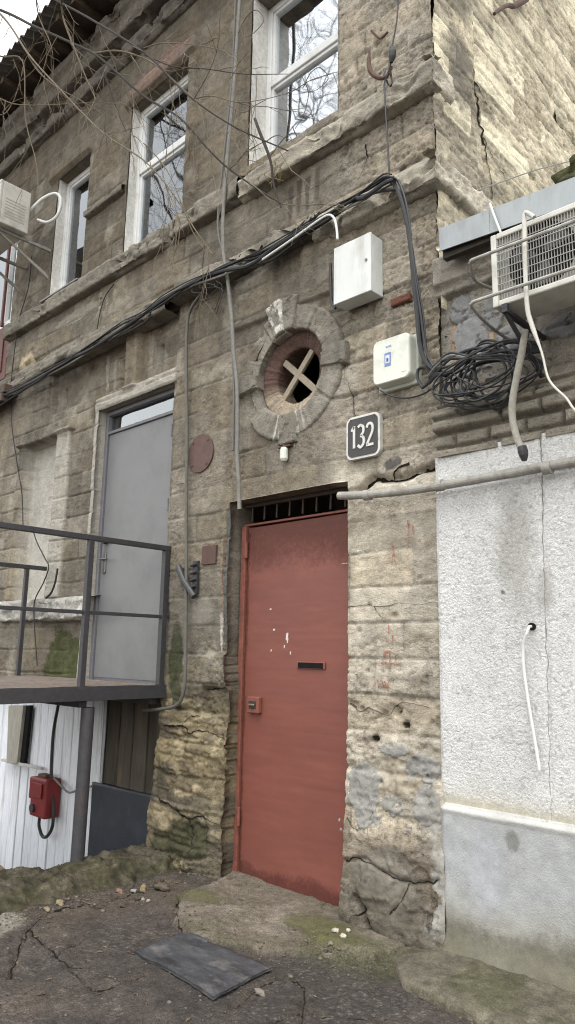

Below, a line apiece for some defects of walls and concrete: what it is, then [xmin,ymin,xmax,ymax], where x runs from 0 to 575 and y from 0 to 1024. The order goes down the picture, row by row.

crack [473,68,505,199]
spalling [265,299,284,334]
crack [367,462,436,490]
crack [164,715,225,739]
crack [158,796,216,853]
peeling [338,742,445,933]
crack [346,796,438,925]
crack [9,892,145,992]